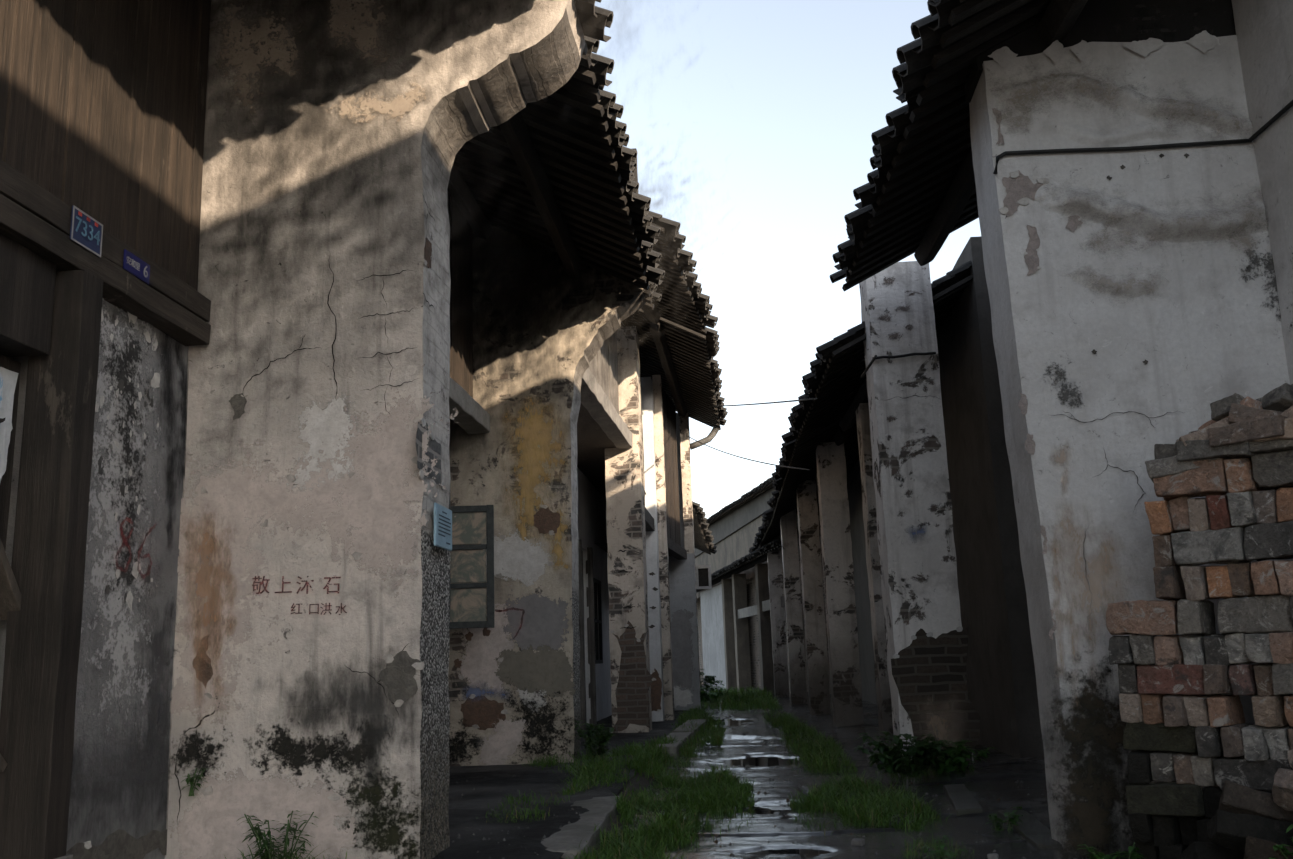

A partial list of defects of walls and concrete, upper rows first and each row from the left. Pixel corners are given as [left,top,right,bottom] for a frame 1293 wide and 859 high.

flaking render [610,621,694,733]